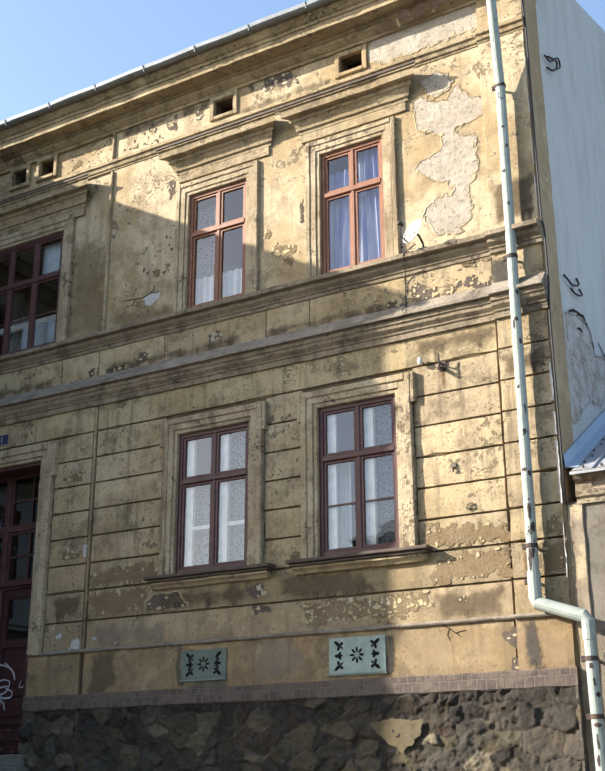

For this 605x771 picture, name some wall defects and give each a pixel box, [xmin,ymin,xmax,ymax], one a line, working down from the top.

flaking render [367,0,477,66]
flaking render [248,71,299,92]
flaking render [411,70,483,236]
flaking render [263,229,300,268]
flaking render [132,290,162,309]
flaking render [375,255,493,311]
flaking render [563,311,605,425]
flaking render [299,521,513,629]
leakage [526,621,544,670]